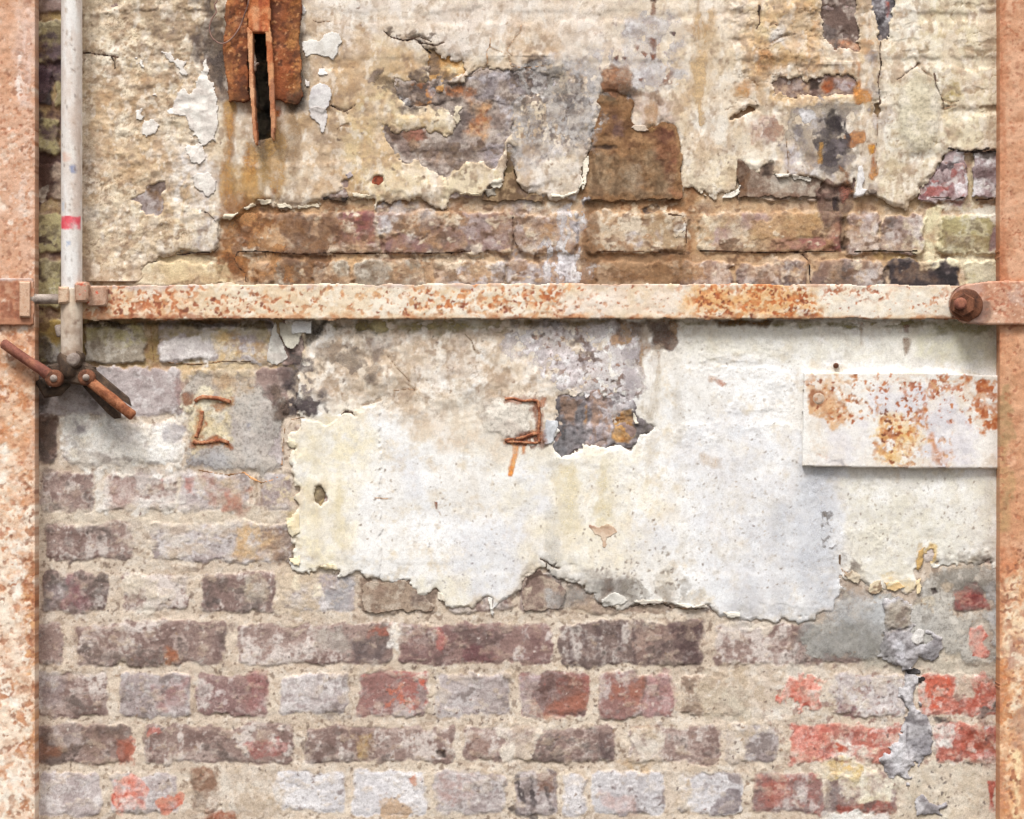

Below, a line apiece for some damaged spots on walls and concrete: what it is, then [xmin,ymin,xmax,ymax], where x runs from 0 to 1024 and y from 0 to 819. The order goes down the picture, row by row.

spalling [772,74,858,98]
peeling [161,51,218,197]
spalling [382,49,683,202]
spalling [722,159,823,200]
peeling [853,165,877,198]
spalling [918,149,996,201]
leakage [217,202,342,283]
peeling [267,321,312,365]
corrosion [183,393,233,450]
corrosion [508,397,546,476]
spalling [543,387,654,457]
spalling [314,486,326,506]